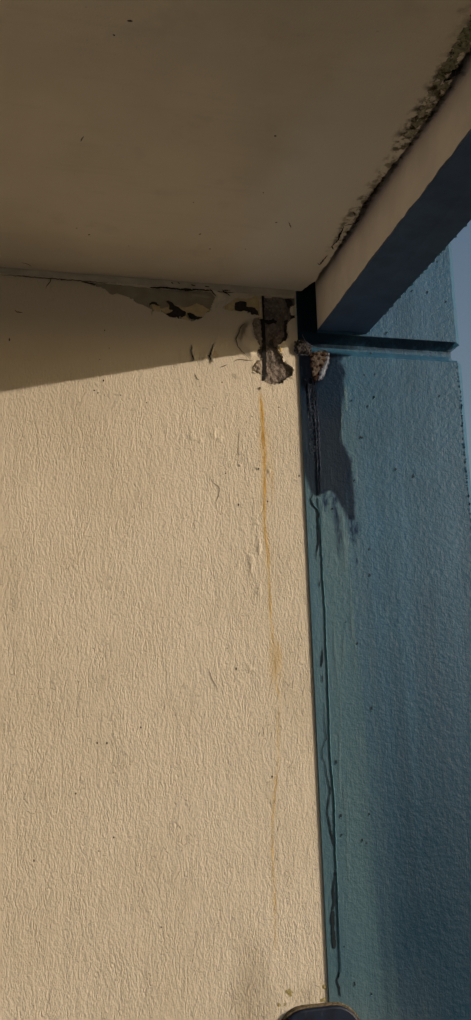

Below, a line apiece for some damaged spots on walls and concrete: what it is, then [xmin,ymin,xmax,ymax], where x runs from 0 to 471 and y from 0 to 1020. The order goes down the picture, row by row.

spalling [401,15,471,147]
flaking render [86,281,330,385]
leakage [299,353,354,565]
crack [322,707,335,846]
crack [329,872,337,949]